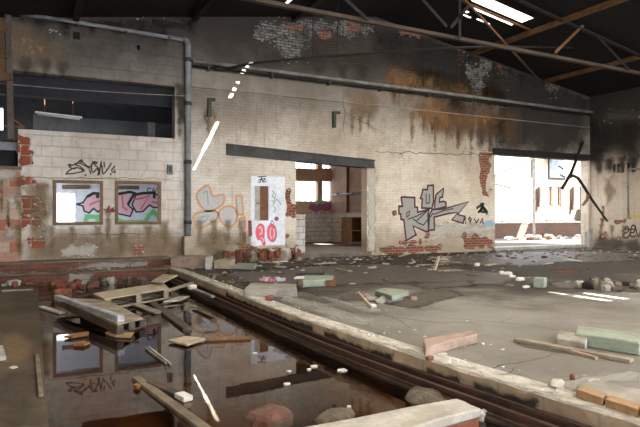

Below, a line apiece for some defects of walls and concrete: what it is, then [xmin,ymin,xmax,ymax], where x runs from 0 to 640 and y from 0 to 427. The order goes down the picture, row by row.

peeling [252,17,374,65]
rust [388,67,499,103]
rust [410,99,512,155]
peeling [0,135,36,185]
crack [376,142,492,166]
peeling [478,149,492,196]
water stain [594,156,637,173]
peeling [8,195,41,228]
water stain [30,185,182,259]
peeling [285,188,297,218]
peeling [378,232,442,255]
peeling [462,232,495,249]